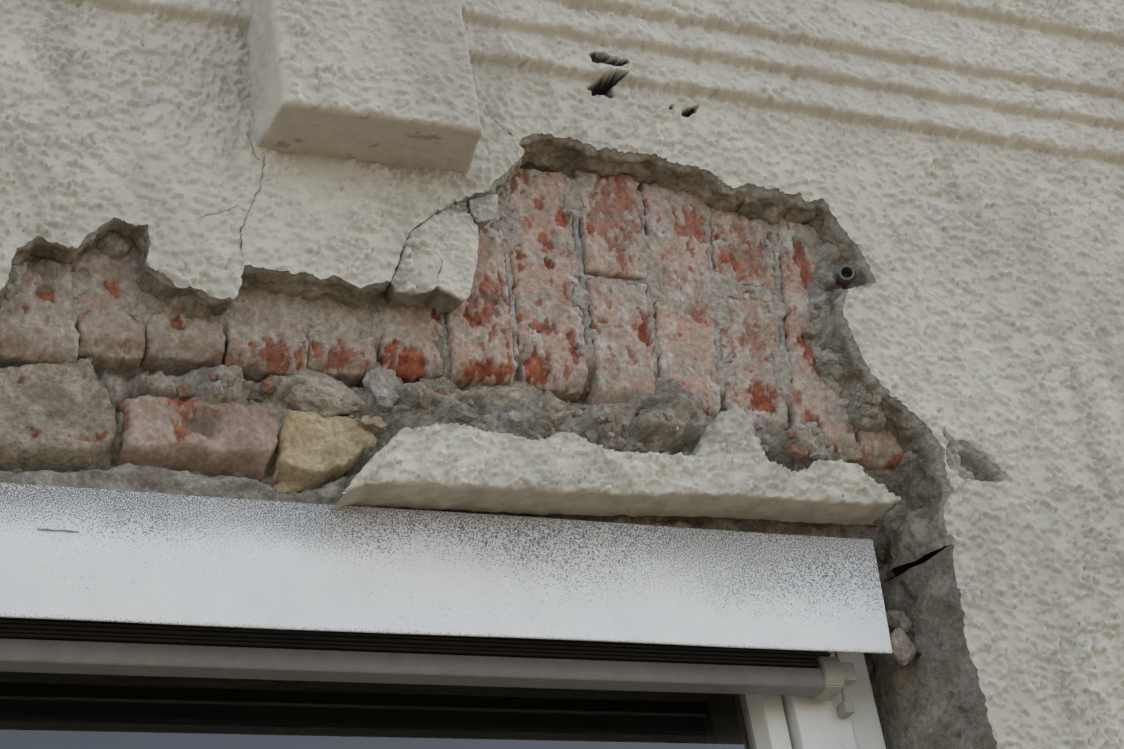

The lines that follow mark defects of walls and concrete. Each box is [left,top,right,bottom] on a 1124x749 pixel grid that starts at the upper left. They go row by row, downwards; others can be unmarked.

crack [393,192,497,273]
flaking render [0,133,1008,749]